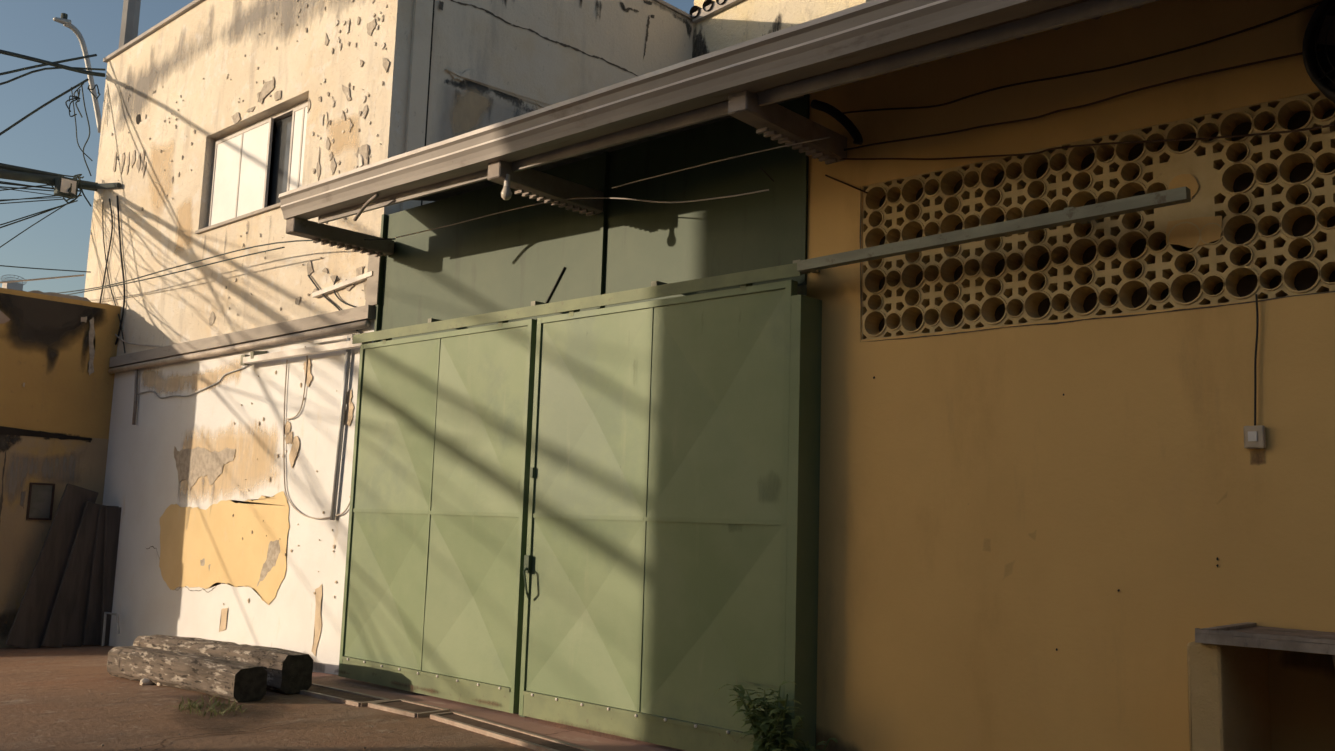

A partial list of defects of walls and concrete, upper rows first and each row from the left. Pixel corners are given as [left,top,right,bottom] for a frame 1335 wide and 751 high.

crack [451,0,650,76]
peeling [231,67,281,124]
peeling [307,0,390,181]
leakage [446,80,534,128]
peeling [113,95,195,211]
peeling [280,257,367,311]
leakage [0,293,102,366]
peeling [174,446,236,490]
peeling [277,421,300,469]
peeling [159,477,299,605]
peeling [219,603,228,632]
peeling [312,571,337,656]